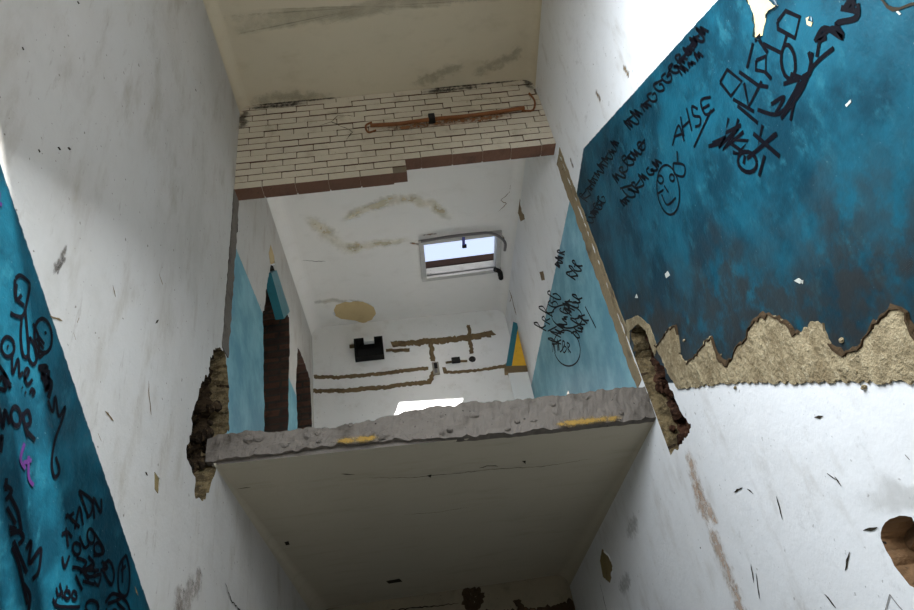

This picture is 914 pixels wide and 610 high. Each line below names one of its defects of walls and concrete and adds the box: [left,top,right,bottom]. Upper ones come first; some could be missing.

peeling [746,0,778,41]
crack [881,0,914,12]
spalling [186,147,914,501]
spalling [881,516,914,587]
spalling [461,587,485,610]